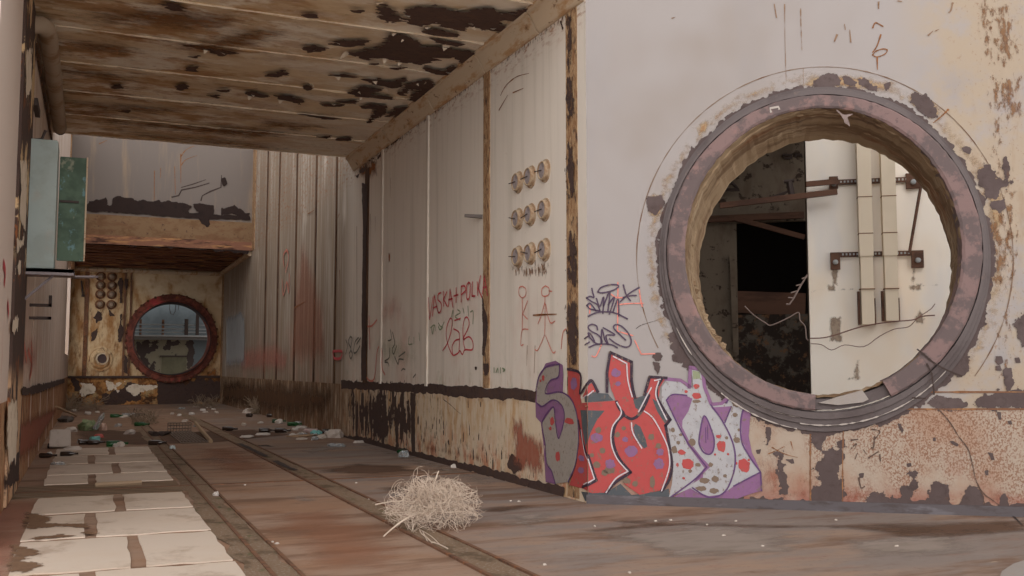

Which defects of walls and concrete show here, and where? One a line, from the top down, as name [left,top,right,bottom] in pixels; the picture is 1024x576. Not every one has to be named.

peeling [245,2,528,123]
peeling [565,14,574,126]
rust [837,22,888,89]
rust [982,3,1017,67]
rust [989,77,1022,148]
peeling [87,196,250,227]
peeling [565,230,577,287]
peeling [646,73,1024,507]
rust [982,191,1018,291]
peeling [6,340,220,488]
rust [507,421,542,475]
crack [912,349,1024,526]